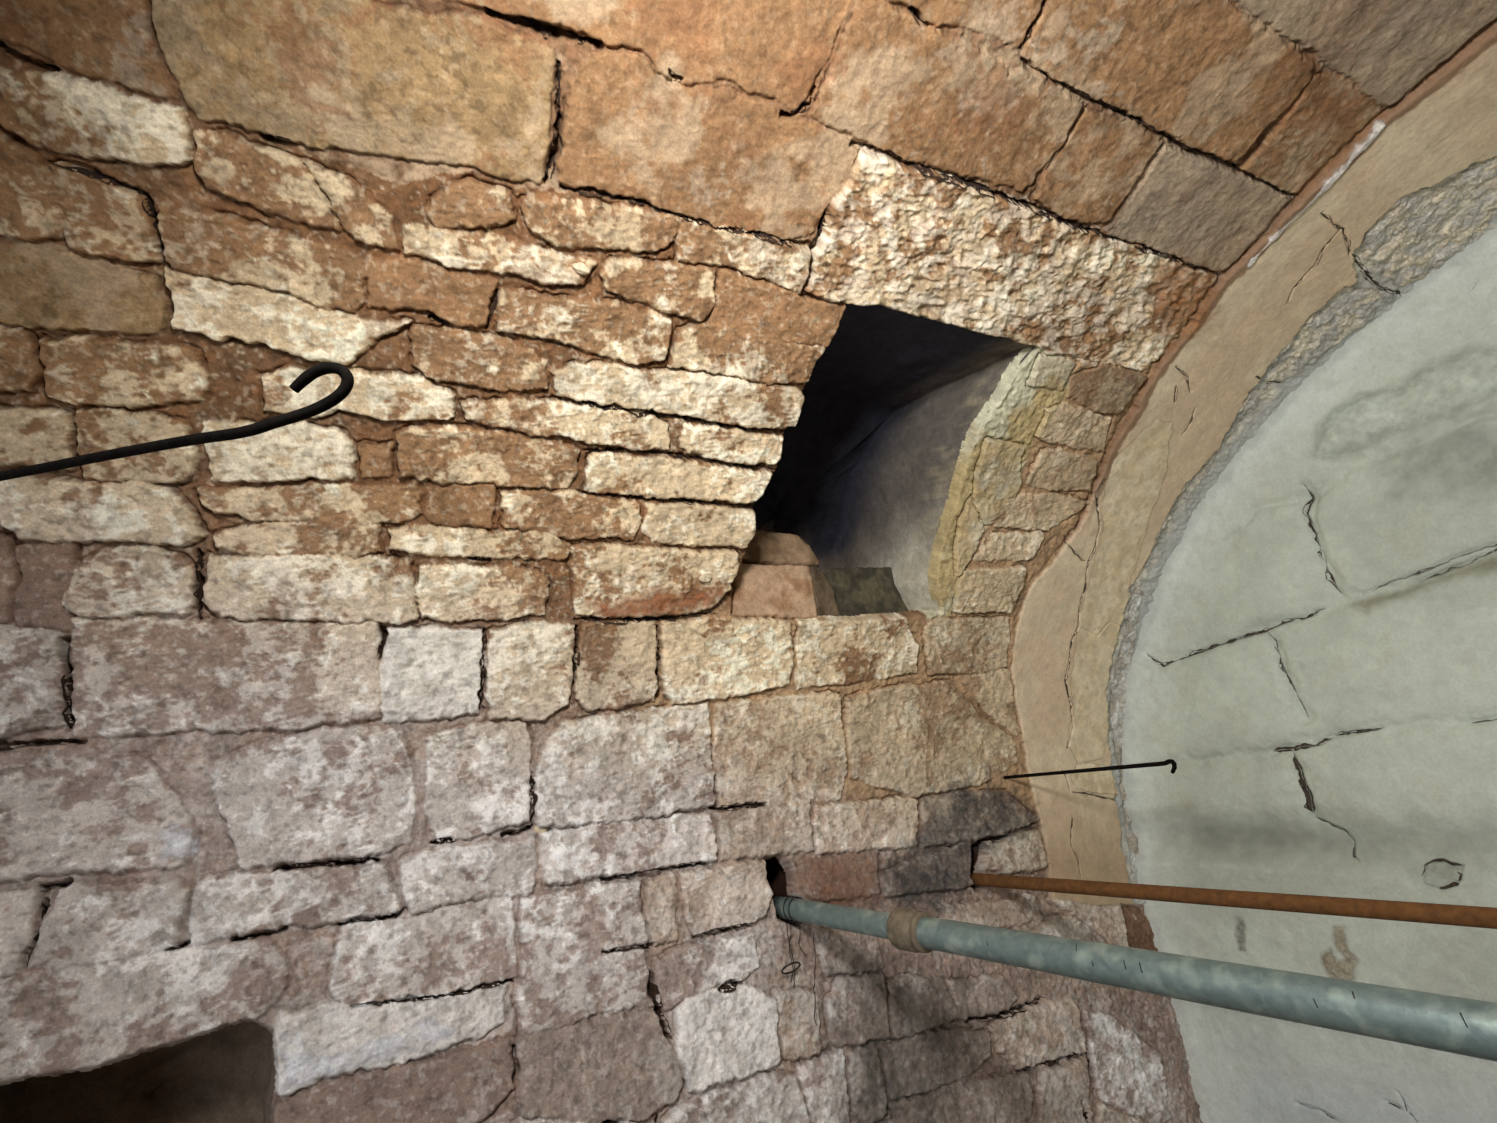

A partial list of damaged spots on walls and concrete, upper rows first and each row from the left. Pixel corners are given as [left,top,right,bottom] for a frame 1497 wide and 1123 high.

crack [1288,213,1401,300]
crack [1174,367,1196,429]
flaking render [1067,156,1497,872]
crack [1148,485,1497,858]
spalling [1422,858,1464,889]
spalling [1322,927,1357,981]